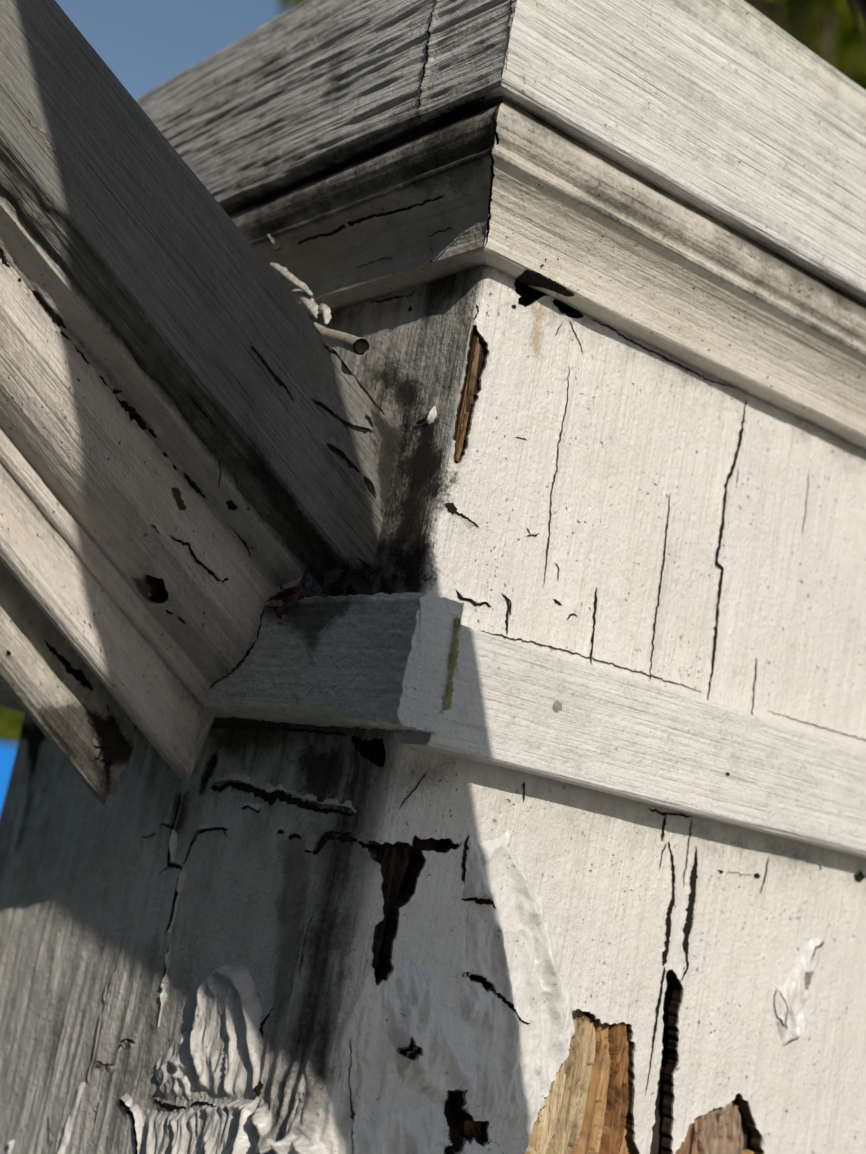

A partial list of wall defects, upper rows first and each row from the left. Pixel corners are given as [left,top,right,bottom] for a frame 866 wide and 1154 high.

crack [418,0,437,108]
crack [267,189,444,251]
damp [363,355,457,593]
crack [456,318,747,700]
crack [751,659,866,741]
damp [296,744,342,806]
crack [140,773,357,1027]
crack [646,808,698,1091]
crack [88,941,218,1154]
crack [253,1008,302,1096]
crack [348,1038,356,1152]